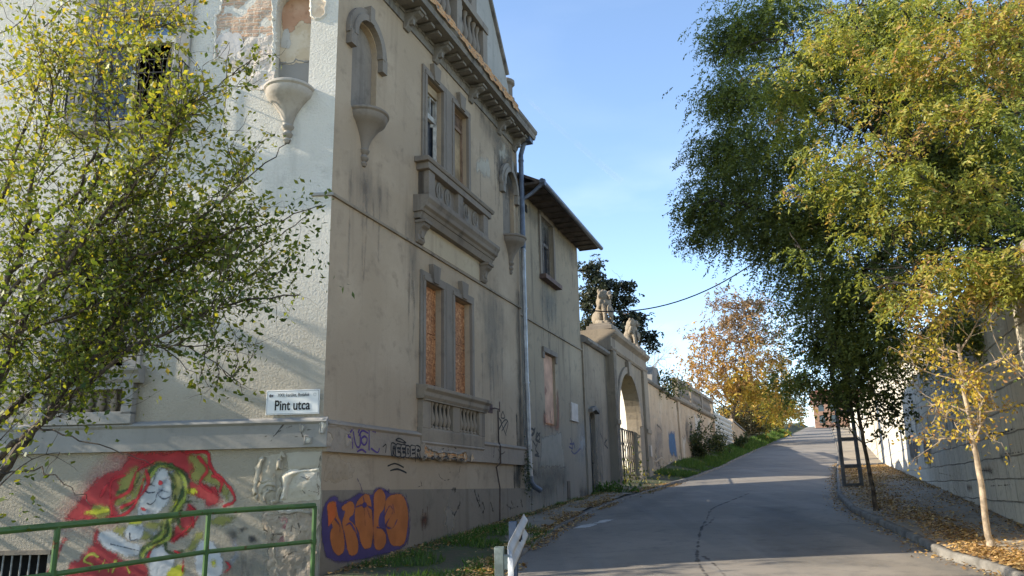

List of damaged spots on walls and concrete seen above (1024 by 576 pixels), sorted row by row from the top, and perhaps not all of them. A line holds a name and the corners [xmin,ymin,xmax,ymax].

flaking render [212,0,328,90]
crack [695,494,747,576]